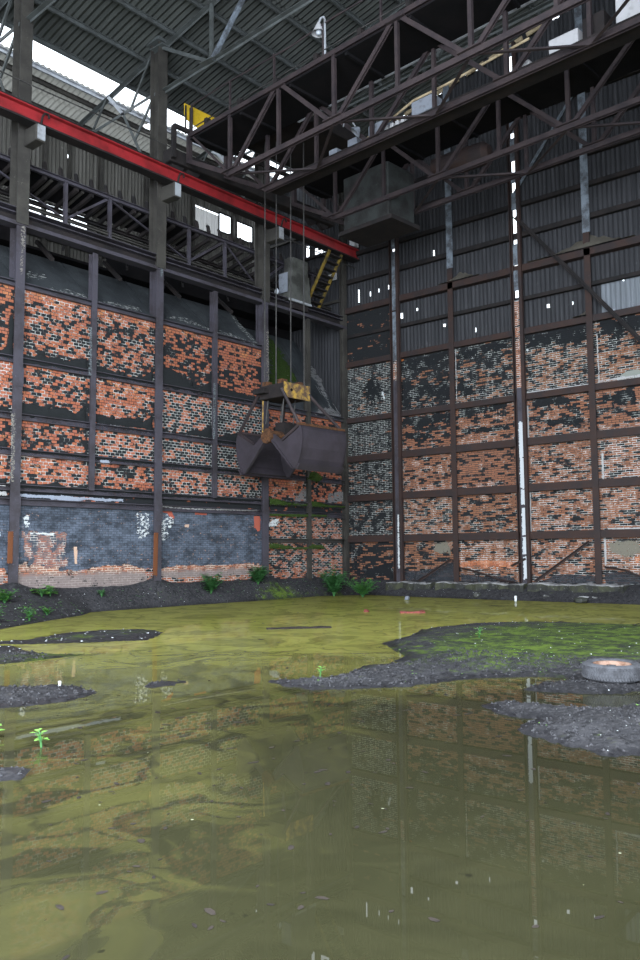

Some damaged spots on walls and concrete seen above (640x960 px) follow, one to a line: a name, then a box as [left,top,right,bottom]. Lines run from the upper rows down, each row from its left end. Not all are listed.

peeling [254,516,279,531]
spalling [18,515,147,588]
spalling [161,563,260,578]